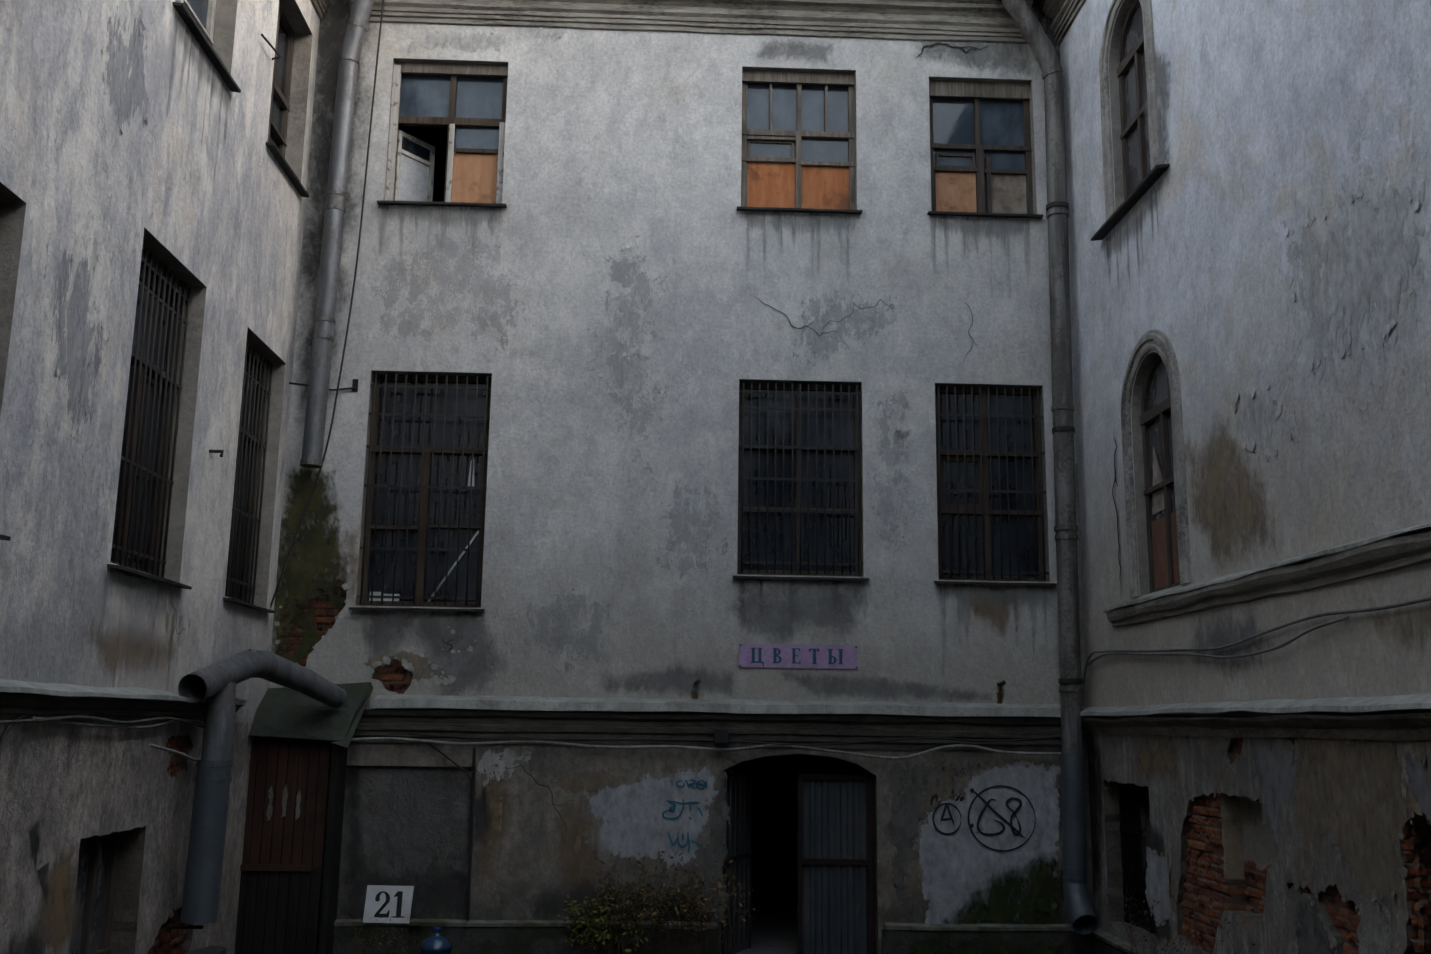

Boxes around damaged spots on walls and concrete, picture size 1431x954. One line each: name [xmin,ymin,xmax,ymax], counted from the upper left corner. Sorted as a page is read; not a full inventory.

crack [754,295,895,337]
damp [1185,428,1266,556]
spalling [364,626,477,695]
spalling [1145,790,1280,954]
spalling [1398,751,1431,954]
spalling [147,907,189,954]
spalling [1284,880,1361,954]